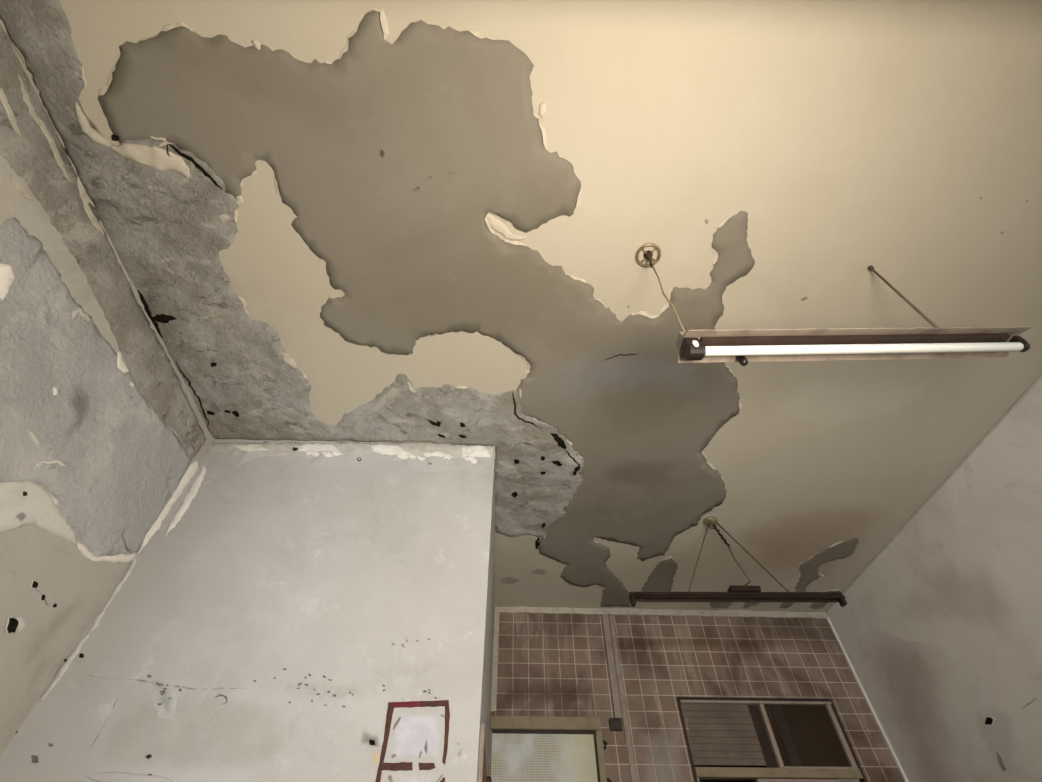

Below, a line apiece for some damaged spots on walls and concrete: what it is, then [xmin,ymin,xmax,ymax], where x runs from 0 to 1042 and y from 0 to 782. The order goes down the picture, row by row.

peeling [0,0,755,607]
peeling [779,538,861,610]